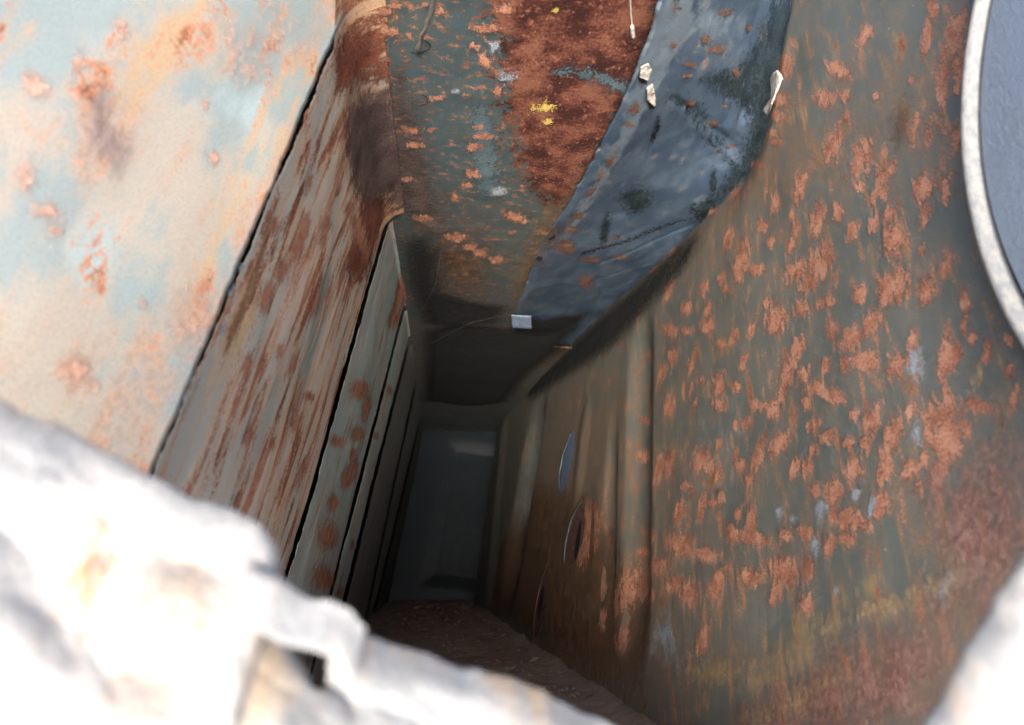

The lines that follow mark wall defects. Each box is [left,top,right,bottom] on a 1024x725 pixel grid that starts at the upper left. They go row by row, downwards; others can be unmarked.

rust [856,22,874,48]
rust [908,0,970,153]
rust [256,3,433,321]
rust [450,168,481,202]
rust [466,0,662,289]
rust [443,232,506,265]
rust [387,269,407,333]
rust [239,344,300,385]
rust [492,50,1024,683]
rust [242,423,257,451]
rust [308,378,380,600]
rust [741,636,937,725]